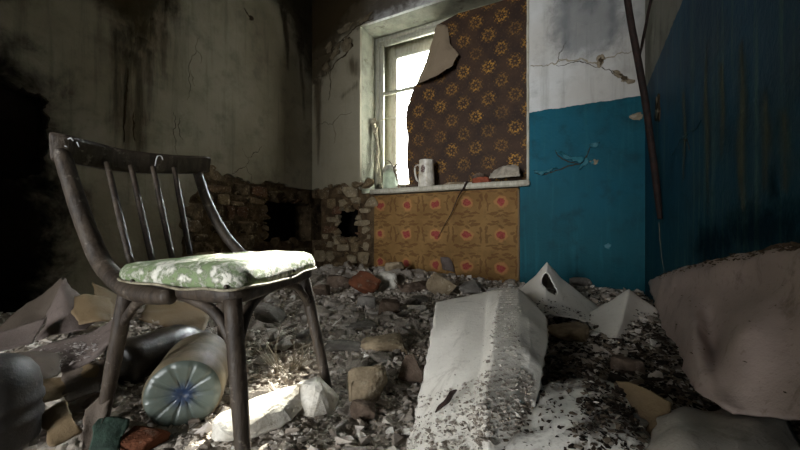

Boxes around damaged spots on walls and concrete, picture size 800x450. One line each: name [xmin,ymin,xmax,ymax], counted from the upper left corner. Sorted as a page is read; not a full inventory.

leakage [99,0,171,48]
flaking render [322,11,373,100]
crack [531,40,632,76]
flaking render [612,70,635,84]
flaking render [179,165,378,269]